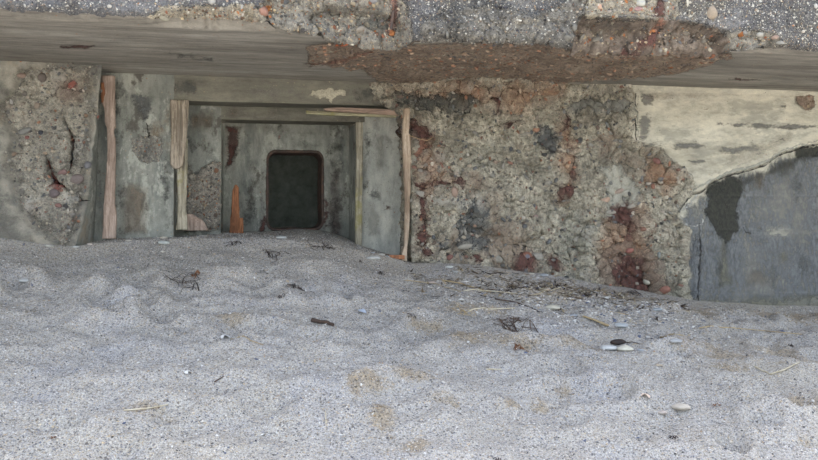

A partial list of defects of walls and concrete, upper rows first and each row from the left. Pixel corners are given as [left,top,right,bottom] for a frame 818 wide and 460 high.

spalling [3,62,102,246]
spalling [98,0,818,300]
damp [675,141,703,150]
crack [678,138,818,213]
corrosion [599,202,663,294]
crack [695,223,703,301]
damp [680,145,818,306]